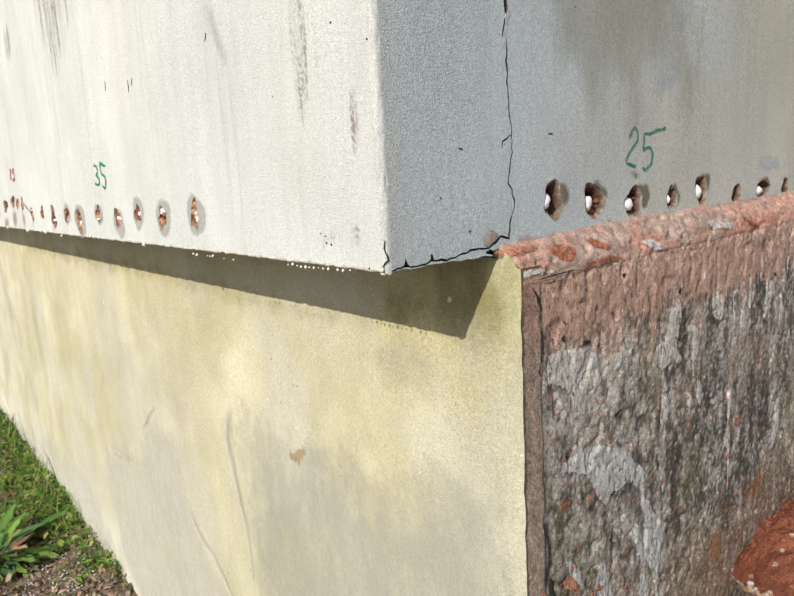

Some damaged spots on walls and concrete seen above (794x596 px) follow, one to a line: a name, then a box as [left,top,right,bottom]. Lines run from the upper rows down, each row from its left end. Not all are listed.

crack [383,0,515,272]
water stain [46,455,92,531]